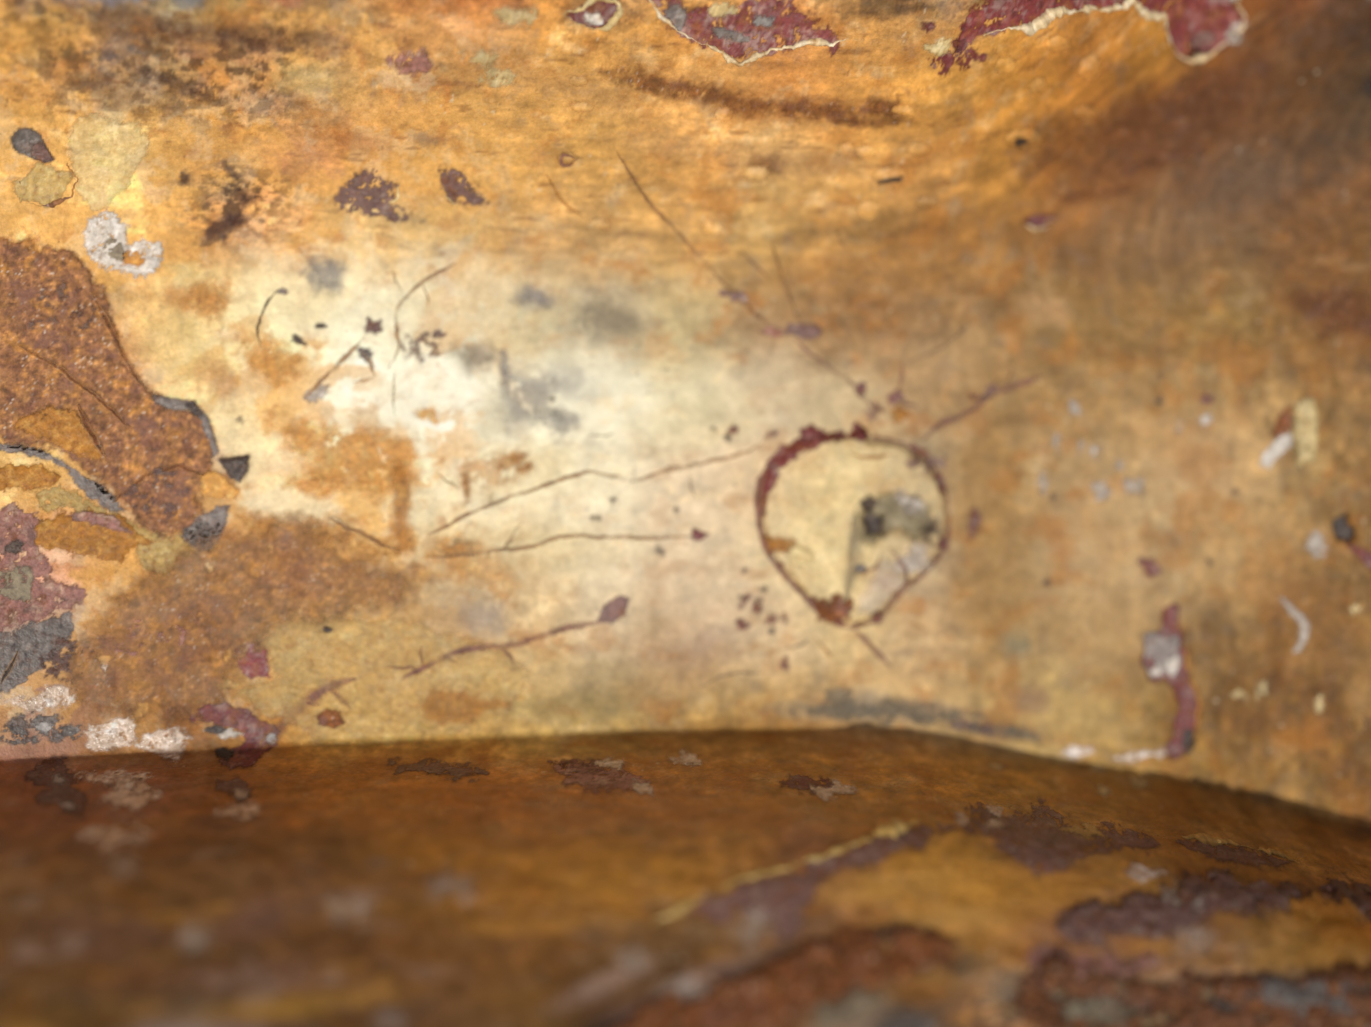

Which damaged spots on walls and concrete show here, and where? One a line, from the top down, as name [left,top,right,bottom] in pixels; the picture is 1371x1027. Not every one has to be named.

peeling [647,0,847,67]
peeling [922,0,1247,75]
crack [617,152,828,366]
corrosion [0,237,249,564]
corrosion [250,339,300,383]
leakage [357,318,383,361]
leakage [401,330,447,363]
crack [428,446,756,558]
peeling [0,502,87,632]
corrosion [0,422,417,760]
crack [306,596,629,706]
peeling [1062,604,1202,798]